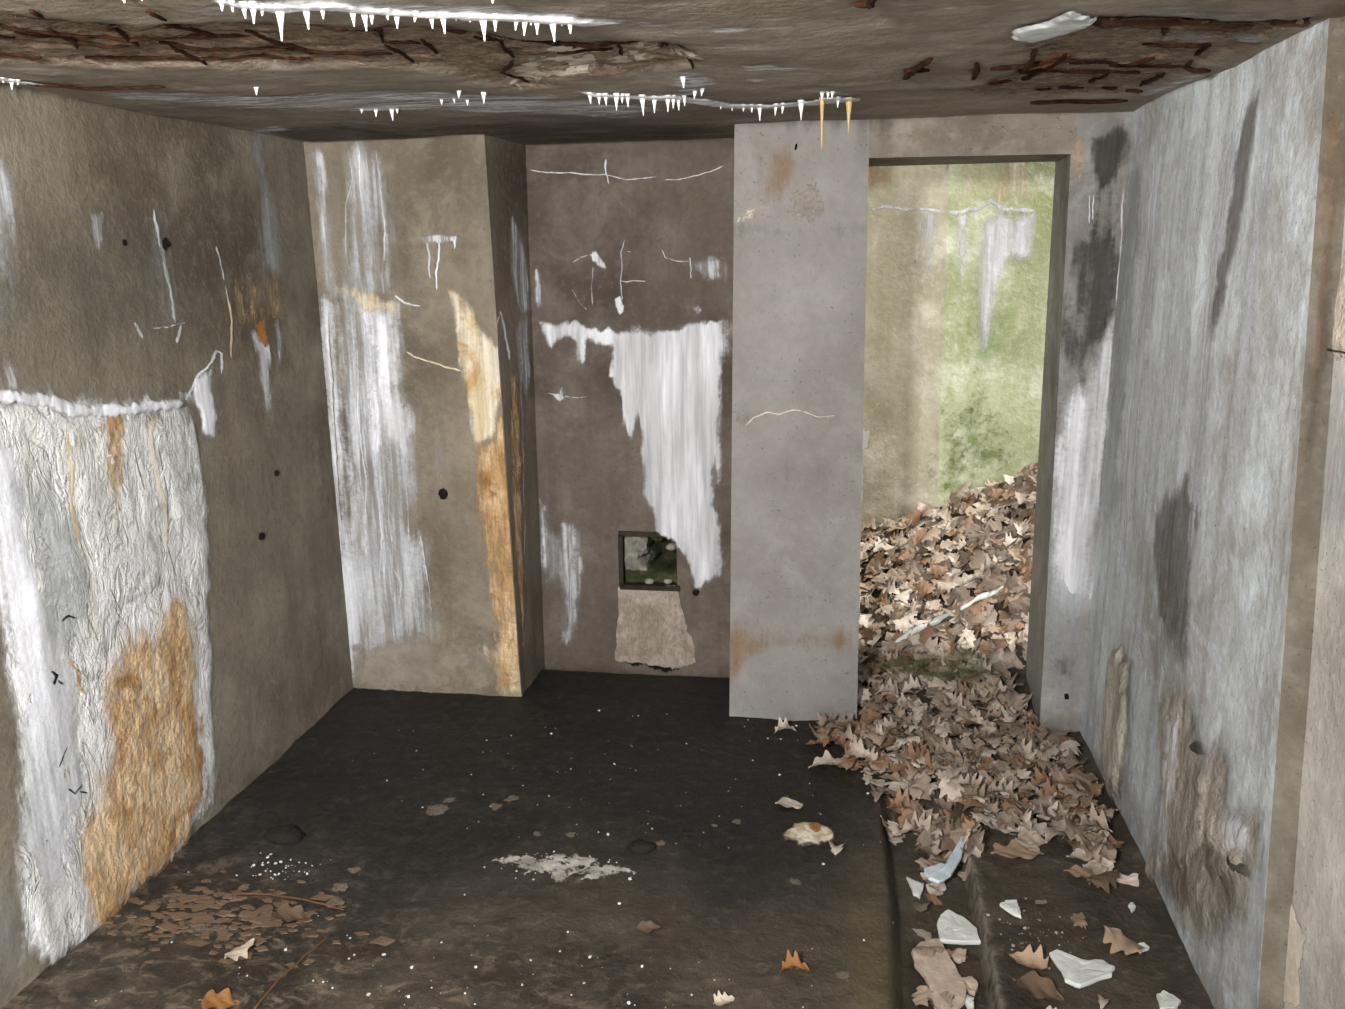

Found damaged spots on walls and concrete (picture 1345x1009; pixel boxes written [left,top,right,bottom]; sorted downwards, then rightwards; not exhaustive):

damp [0,77,39,90]
spalling [0,9,705,91]
damp [214,0,623,42]
rust [67,659,86,695]
damp [0,350,223,963]
rust [83,601,205,925]
damp [112,73,861,693]
rust [477,372,526,692]
spalling [624,536,652,571]
flaking render [615,585,696,672]
damp [1053,127,1166,625]
damp [1154,106,1274,642]